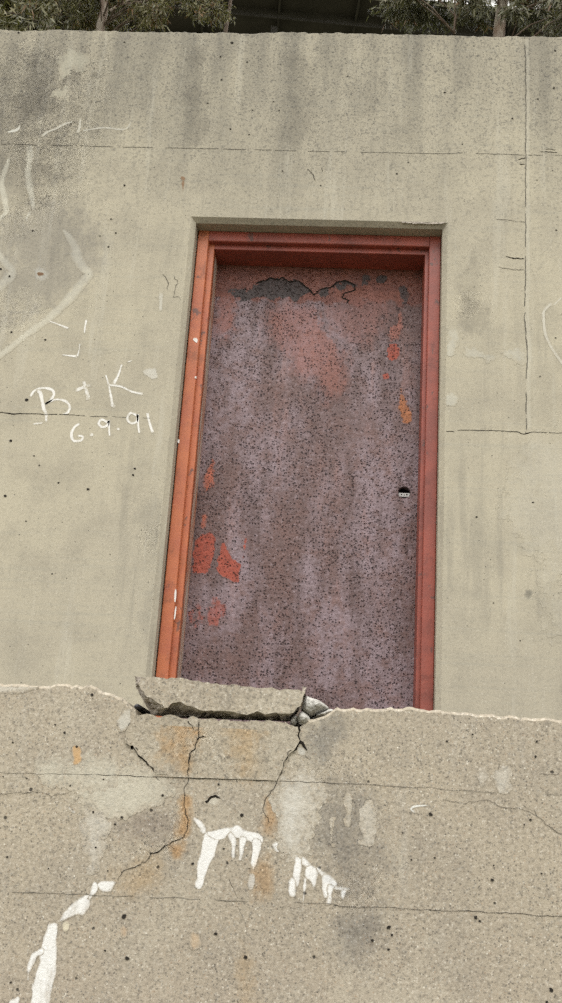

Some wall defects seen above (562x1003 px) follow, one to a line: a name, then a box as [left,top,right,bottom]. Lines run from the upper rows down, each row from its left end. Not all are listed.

rust [256,280,405,409]
crack [117,721,206,880]
crack [263,724,307,822]